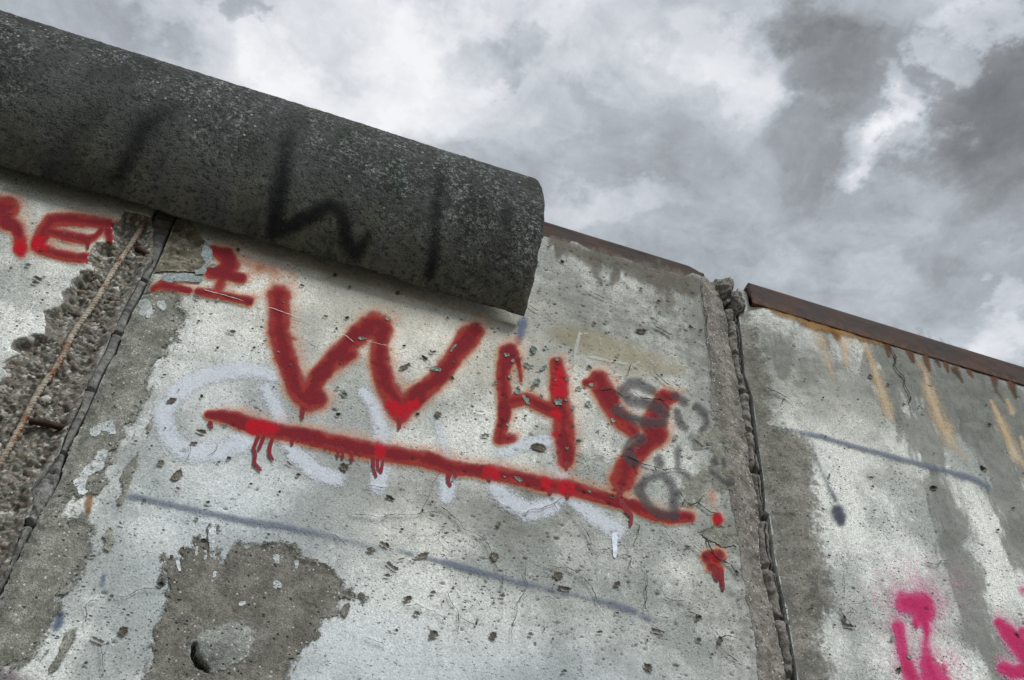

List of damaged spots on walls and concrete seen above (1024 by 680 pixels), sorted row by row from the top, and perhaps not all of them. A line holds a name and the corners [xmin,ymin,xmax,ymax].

peeling [0,211,217,679]
peeling [141,517,370,680]
peeling [673,277,856,680]
rust [772,309,891,417]
rust [907,350,973,447]
damp [861,341,1024,680]